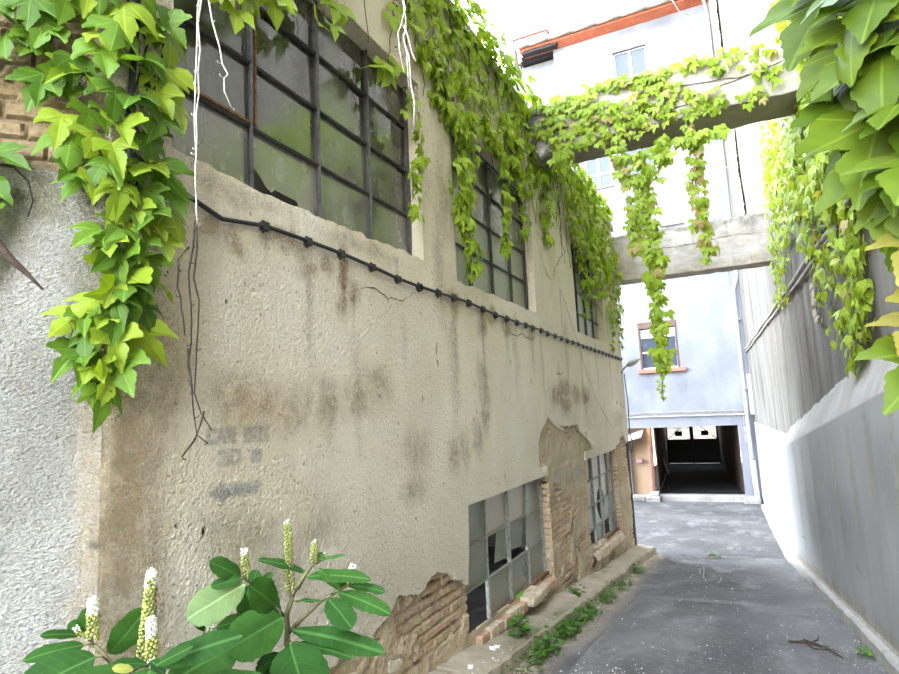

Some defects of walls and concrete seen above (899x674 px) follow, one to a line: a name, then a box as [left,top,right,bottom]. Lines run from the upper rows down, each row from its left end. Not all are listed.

spalling [0,6,107,173]
spalling [329,418,635,674]